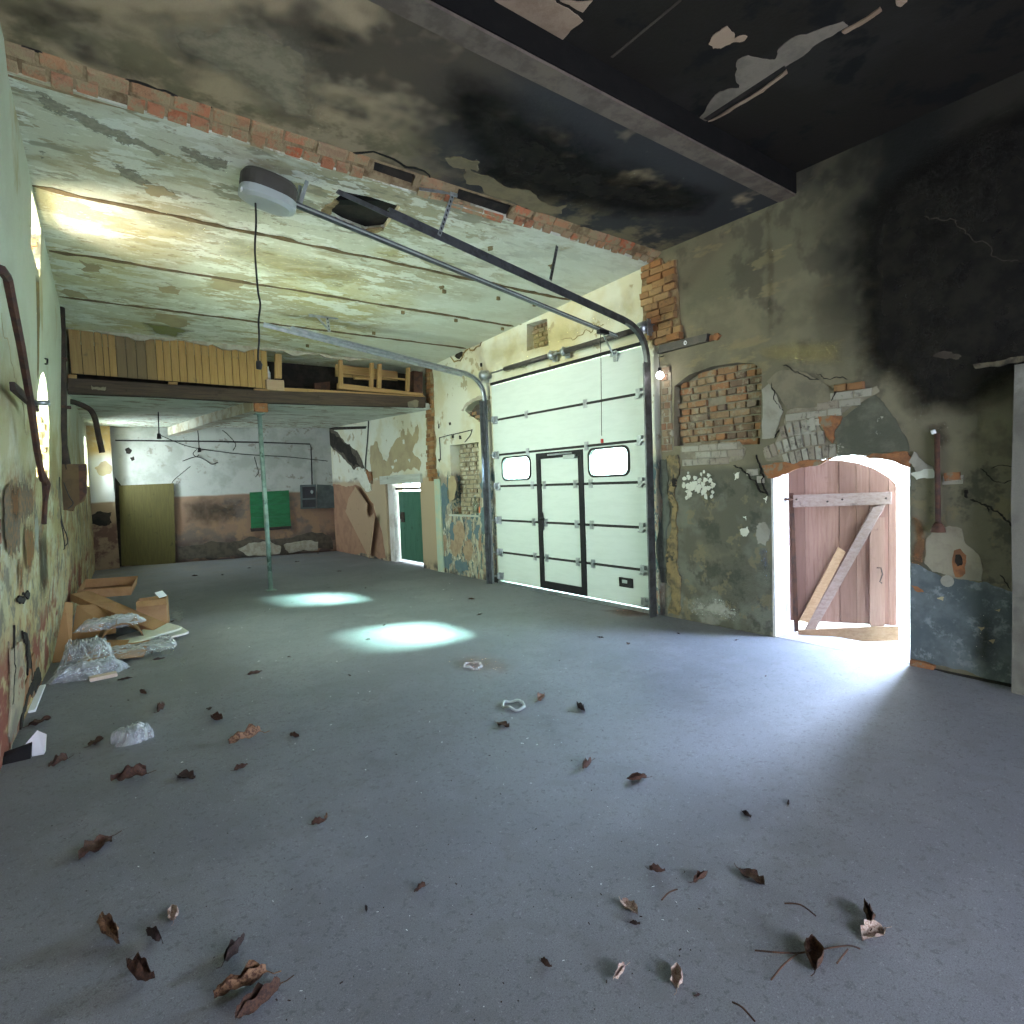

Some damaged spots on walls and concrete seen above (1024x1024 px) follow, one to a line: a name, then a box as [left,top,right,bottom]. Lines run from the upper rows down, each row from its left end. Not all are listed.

flaking render [4,40,370,179]
flaking render [700,7,882,122]
spalling [321,192,397,233]
flaking render [417,156,684,346]
damp [190,503,233,519]
flaking render [370,369,469,573]
flaking render [656,366,879,615]
crack [733,365,848,496]
crack [970,465,1012,526]
peeling [910,526,1012,684]
flaking render [8,631,42,750]